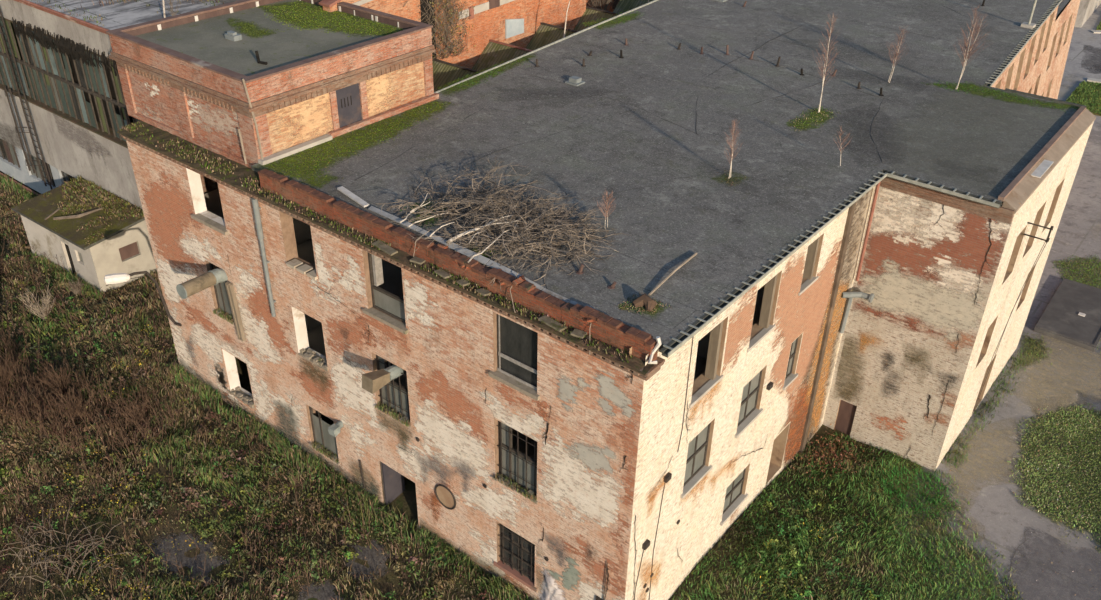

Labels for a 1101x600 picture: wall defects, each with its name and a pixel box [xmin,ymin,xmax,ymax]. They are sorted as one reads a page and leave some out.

flaking render [187,94,239,135]
flaking render [855,187,1010,350]
crack [974,218,995,304]
flaking render [142,172,641,600]
crack [923,380,949,433]